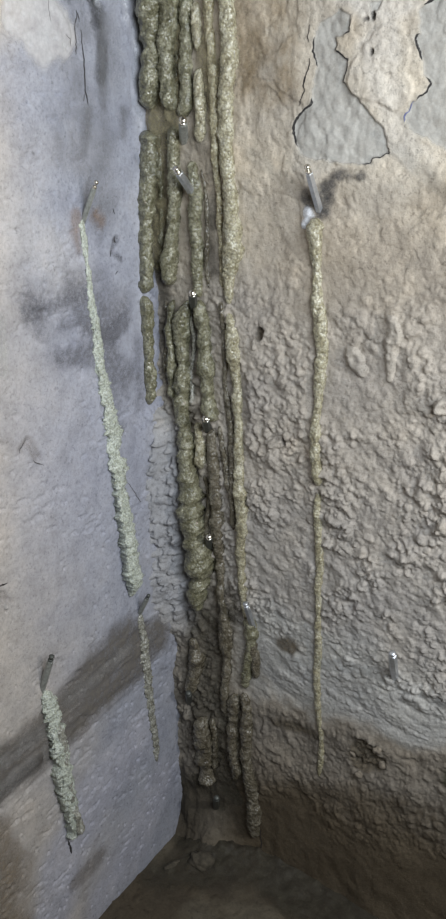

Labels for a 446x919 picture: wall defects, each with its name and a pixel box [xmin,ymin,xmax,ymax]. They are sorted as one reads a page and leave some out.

crack [67,1,90,106]
peeling [292,9,390,164]
peeling [405,0,446,148]
damp [79,299,140,388]